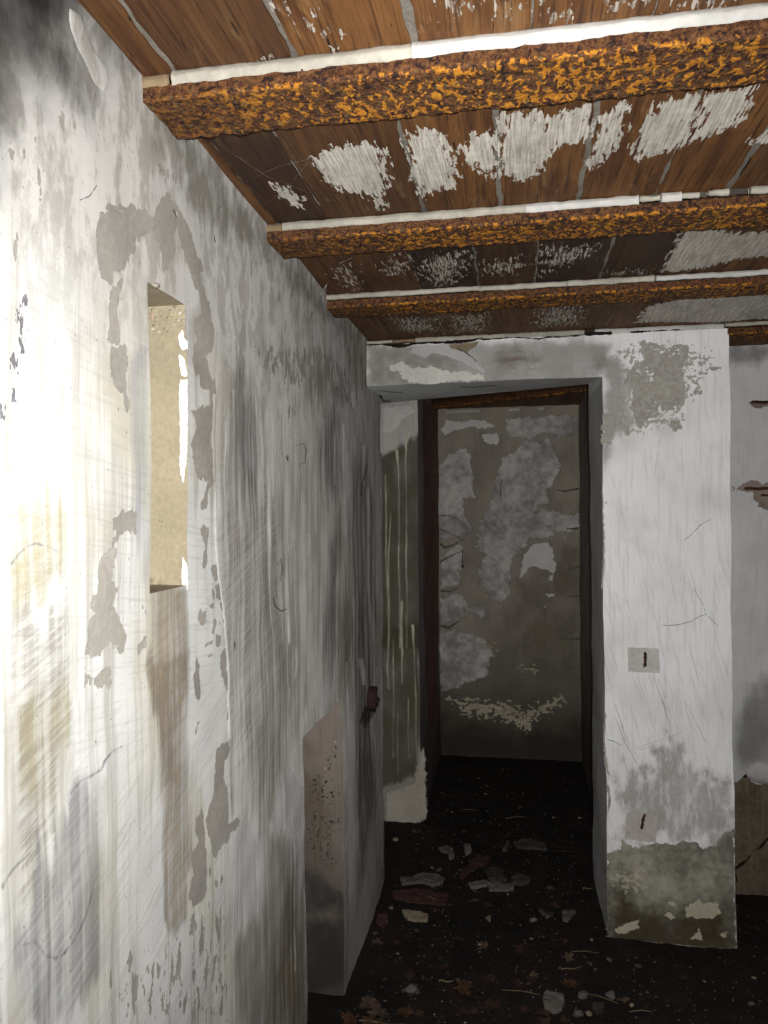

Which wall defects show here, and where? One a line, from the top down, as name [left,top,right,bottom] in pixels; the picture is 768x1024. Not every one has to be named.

peeling [308,140,395,211]
peeling [399,125,501,199]
peeling [584,84,760,172]
damp [0,387,18,420]
damp [10,292,29,375]
peeling [96,164,216,510]
peeling [84,509,147,689]
damp [223,371,283,760]
damp [21,703,98,1021]
damp [147,590,189,927]
damp [614,892,733,949]
peeling [605,745,768,949]